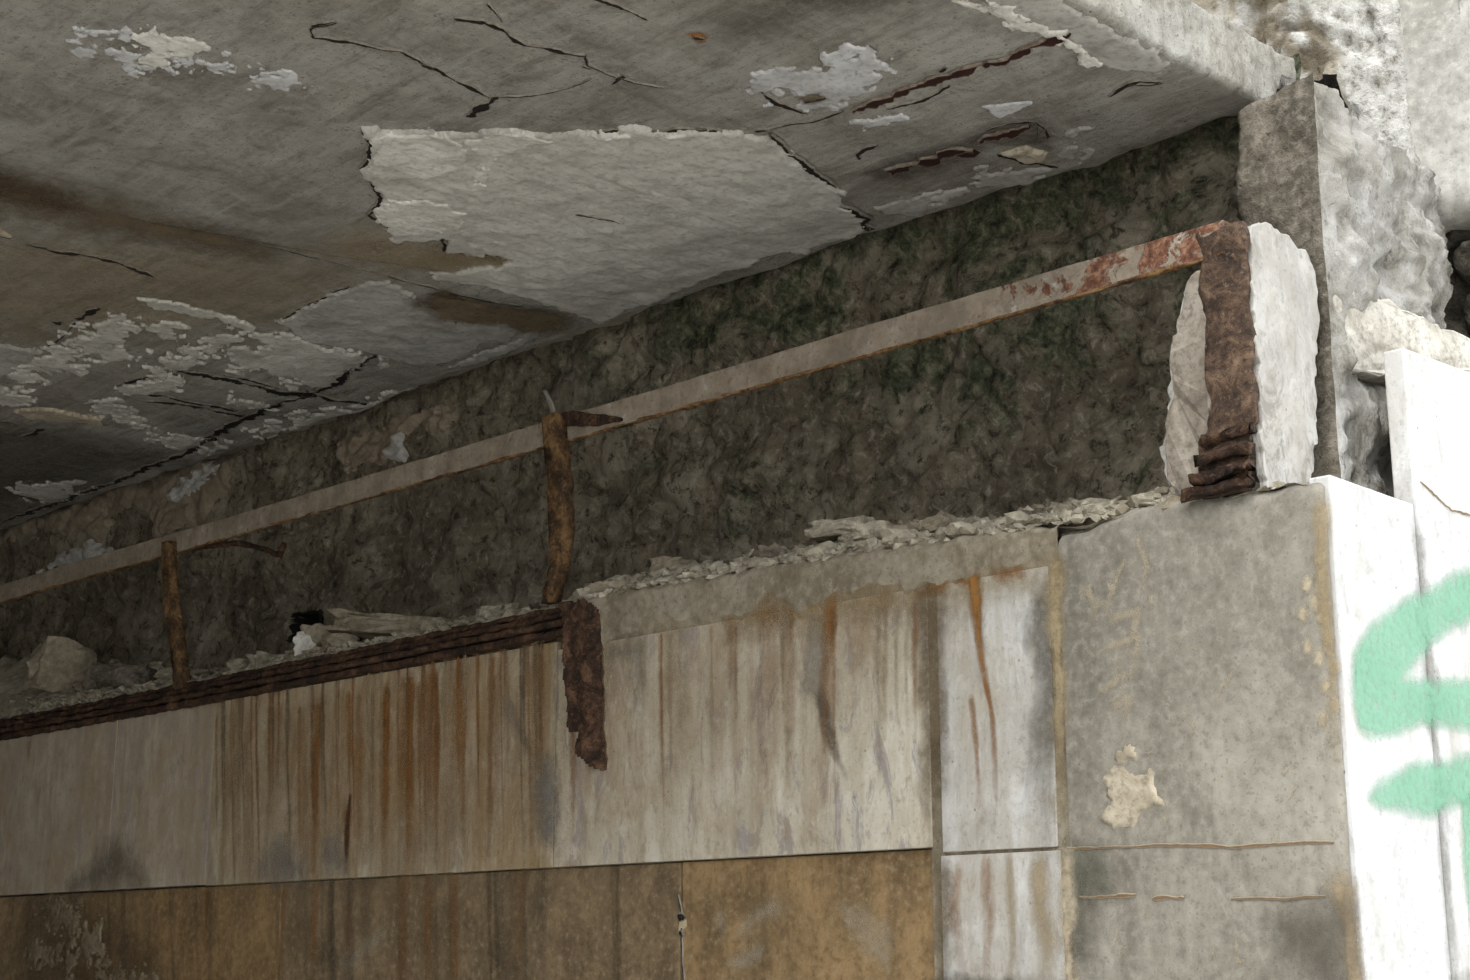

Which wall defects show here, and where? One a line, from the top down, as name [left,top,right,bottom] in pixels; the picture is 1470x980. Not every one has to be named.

peeling [65,24,314,92]
crack [308,0,664,118]
peeling [746,0,1103,132]
flaking render [365,128,553,192]
crack [0,236,156,278]
rust [561,250,1225,443]
flaking render [0,297,414,574]
crack [1420,481,1470,516]
rust [221,668,389,855]
rust [457,631,544,801]
rust [920,574,994,759]
spalling [1099,744,1165,830]